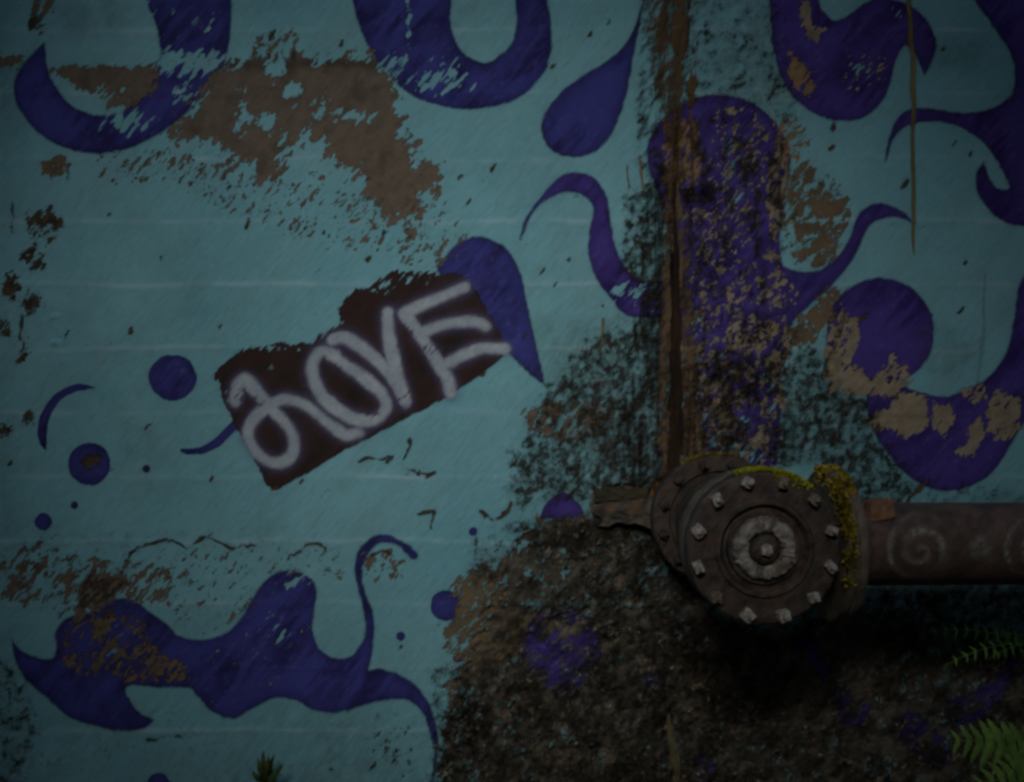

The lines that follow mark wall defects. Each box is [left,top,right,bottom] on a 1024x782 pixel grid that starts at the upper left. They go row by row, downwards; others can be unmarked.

peeling [41,154,71,180]
peeling [48,62,161,111]
peeling [97,27,468,275]
corrosion [644,0,699,496]
peeling [661,102,1023,467]
peeling [0,537,345,683]
peeling [360,548,406,583]
damp [431,513,1024,782]